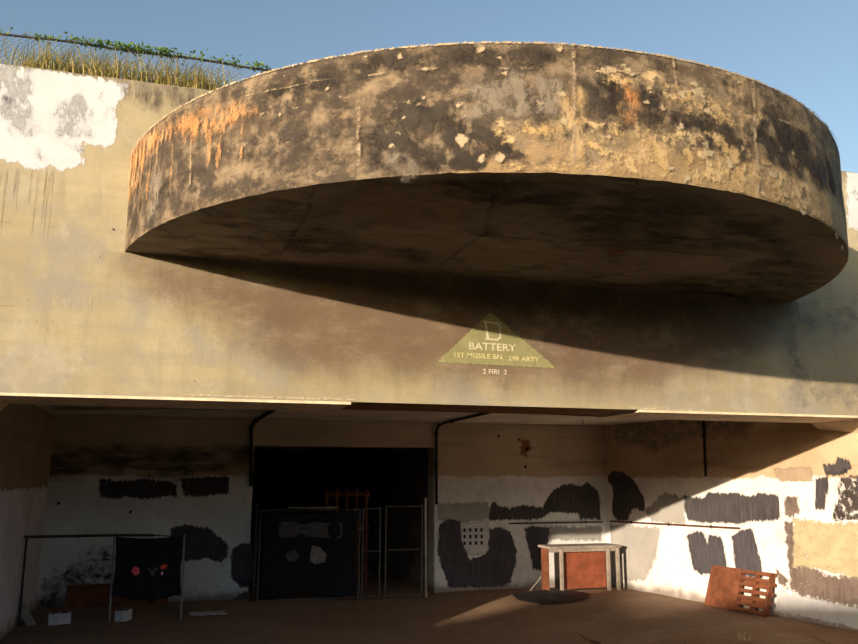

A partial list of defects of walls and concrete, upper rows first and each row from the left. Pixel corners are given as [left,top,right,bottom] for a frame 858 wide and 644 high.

peeling [0,64,129,172]
damp [123,86,194,107]
spalling [142,41,839,148]
peeling [478,63,858,249]
damp [161,45,837,382]